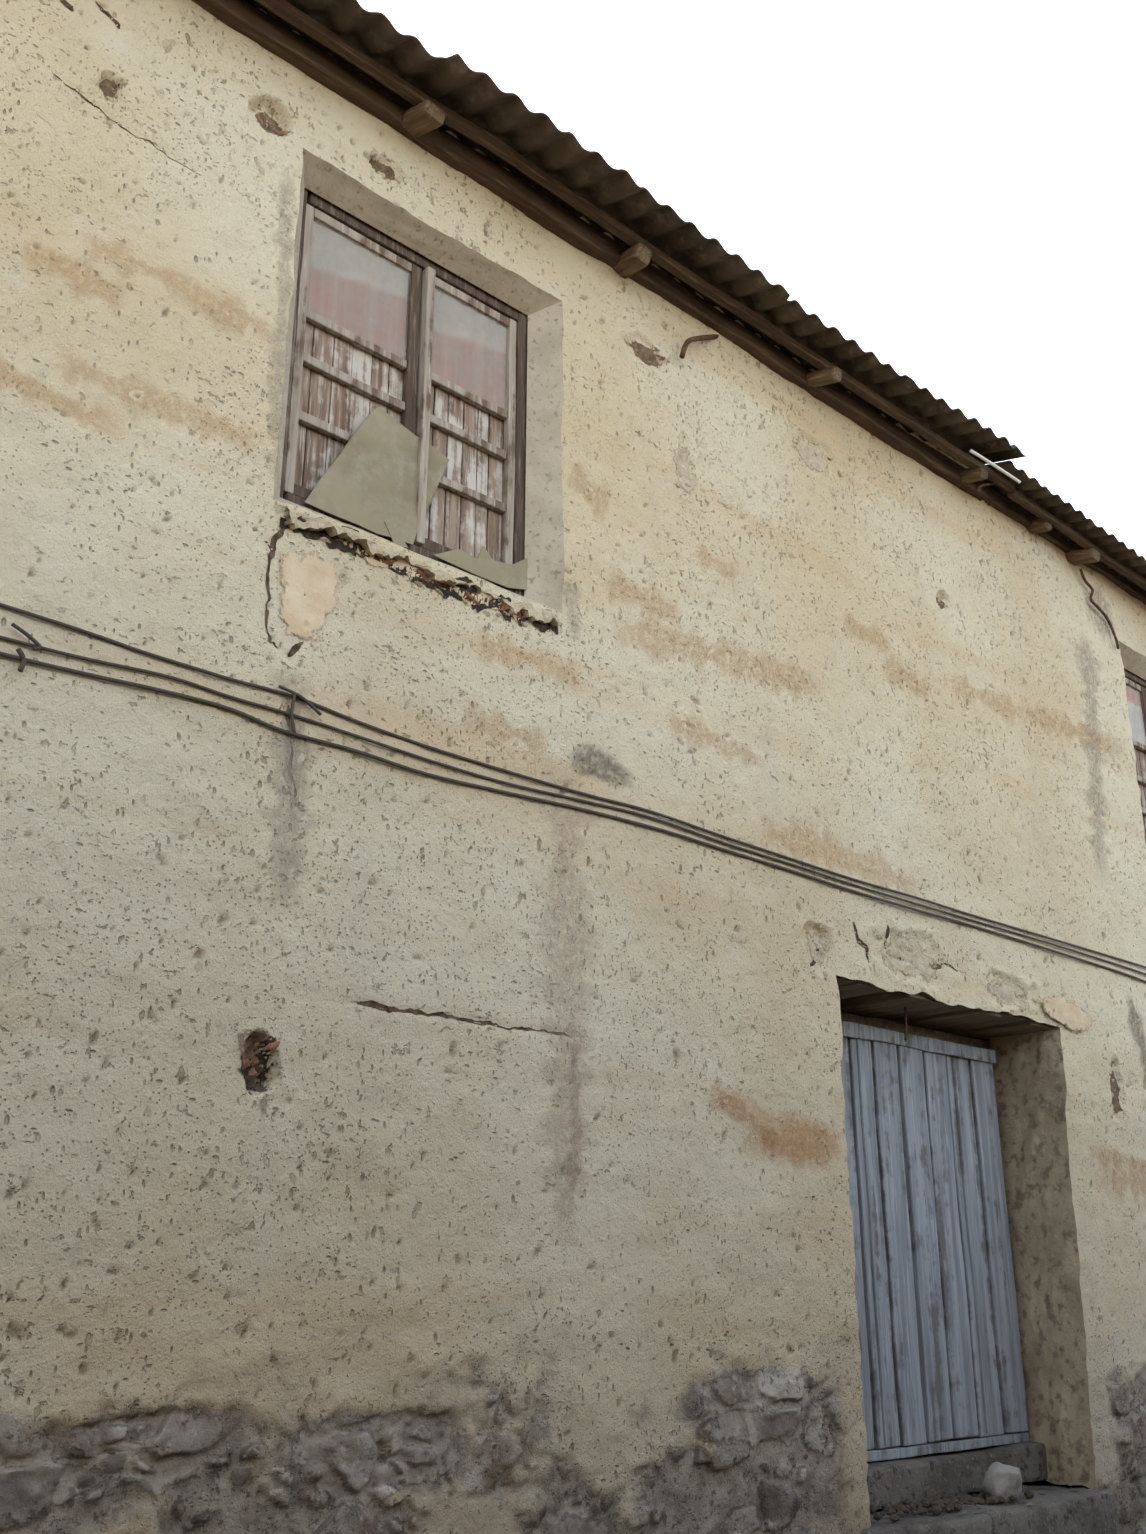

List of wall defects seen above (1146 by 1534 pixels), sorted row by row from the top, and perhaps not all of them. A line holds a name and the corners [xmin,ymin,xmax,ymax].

flaking render [255,112,291,136]
crack [265,527,303,657]
crack [285,705,297,798]
flaking render [238,1029,281,1097]
crack [352,1000,568,1036]
damp [1131,1007,1146,1085]